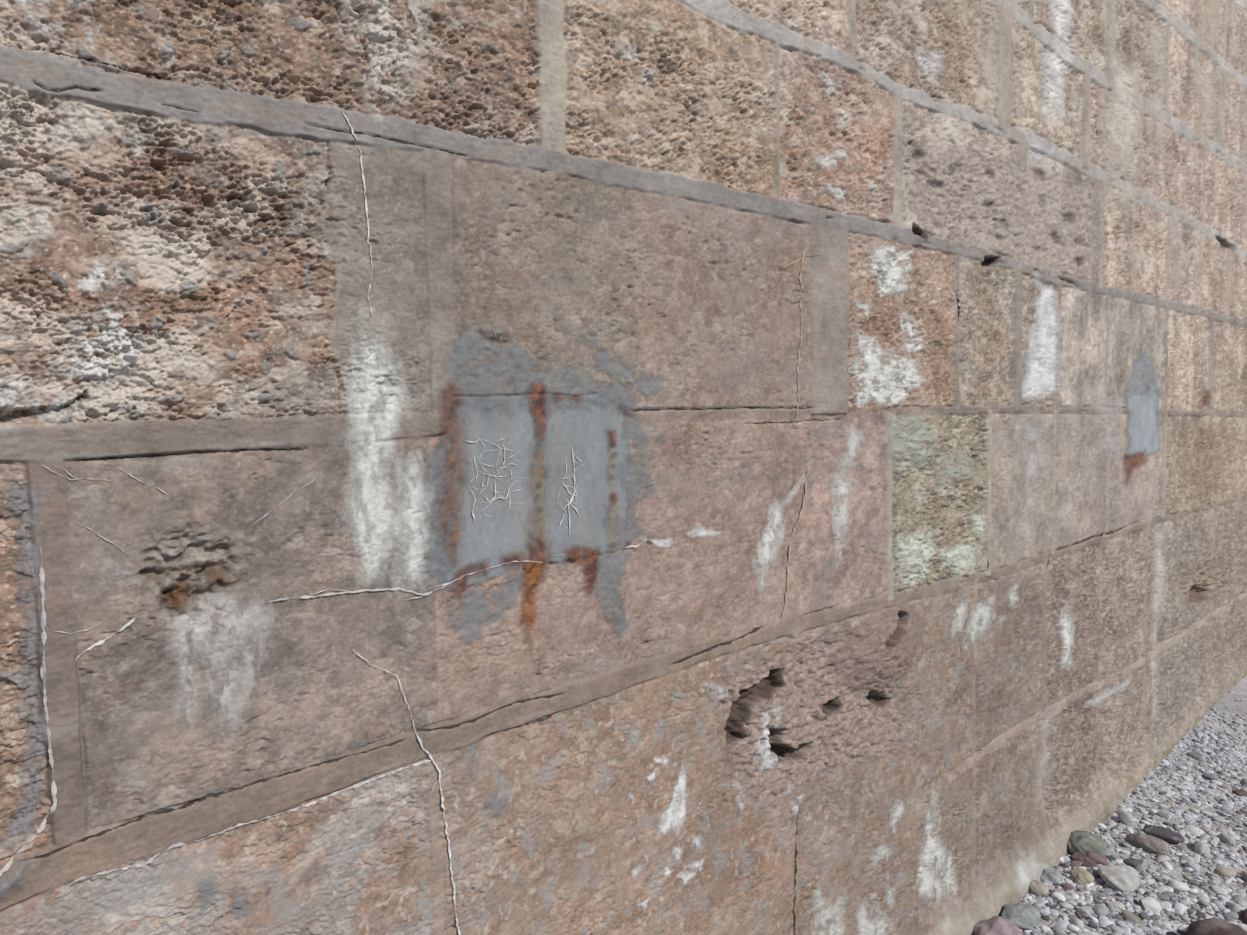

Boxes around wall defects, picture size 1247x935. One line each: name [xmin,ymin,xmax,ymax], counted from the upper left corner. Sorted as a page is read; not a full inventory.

crack [307,112,466,316]
efflorescence [857,246,912,315]
efflorescence [852,316,922,406]
efflorescence [1022,286,1060,399]
spalling [143,544,228,607]
efflorescence [343,336,428,580]
crack [269,438,584,602]
corrosion [506,384,578,623]
corrosion [568,548,598,591]
corrosion [1126,453,1144,473]
crack [0,548,560,935]
spalling [717,642,898,799]